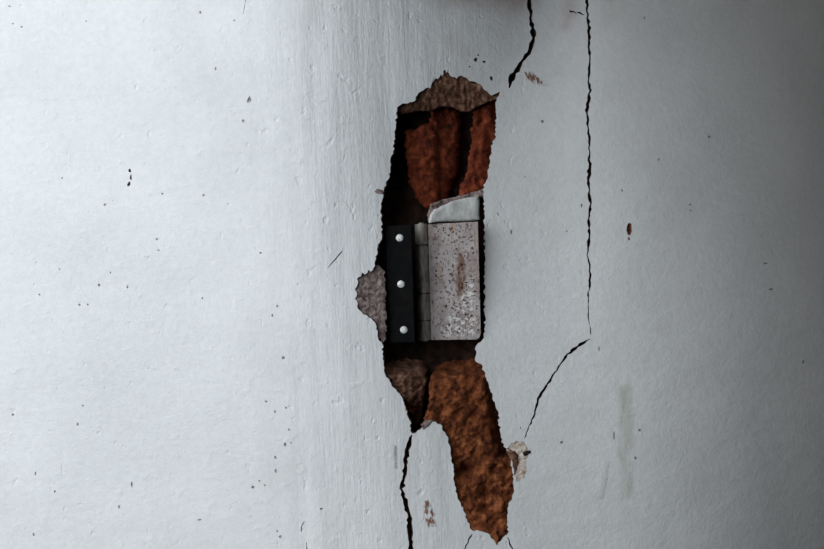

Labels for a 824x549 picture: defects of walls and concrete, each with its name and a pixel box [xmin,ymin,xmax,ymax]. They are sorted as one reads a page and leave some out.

crack [508,0,536,88]
crack [525,0,592,437]
flaking render [355,70,531,544]
corrosion [433,225,479,337]
crack [399,435,414,549]